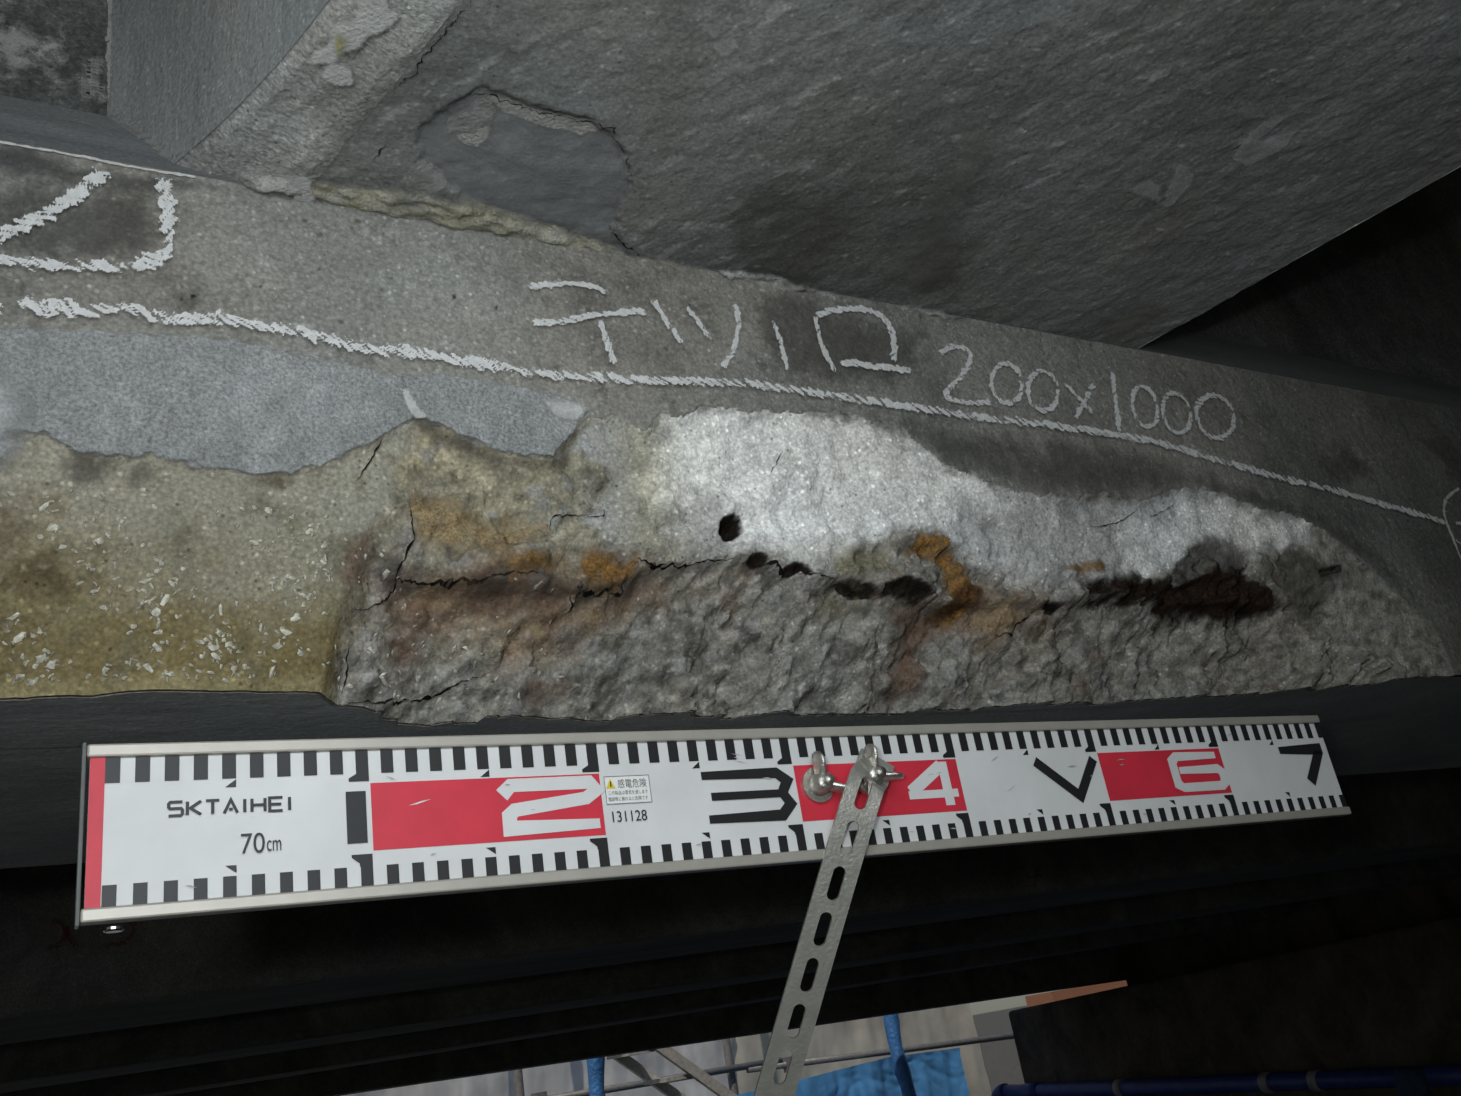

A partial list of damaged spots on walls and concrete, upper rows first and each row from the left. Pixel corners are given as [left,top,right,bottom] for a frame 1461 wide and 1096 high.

peeling [404,86,628,253]
crack [352,504,834,613]
rust [581,552,638,584]
spalling [0,389,1450,727]
rust [834,549,890,576]
rust [888,533,980,698]
crack [991,609,1036,637]
rust [1074,560,1276,630]
crack [339,649,490,706]